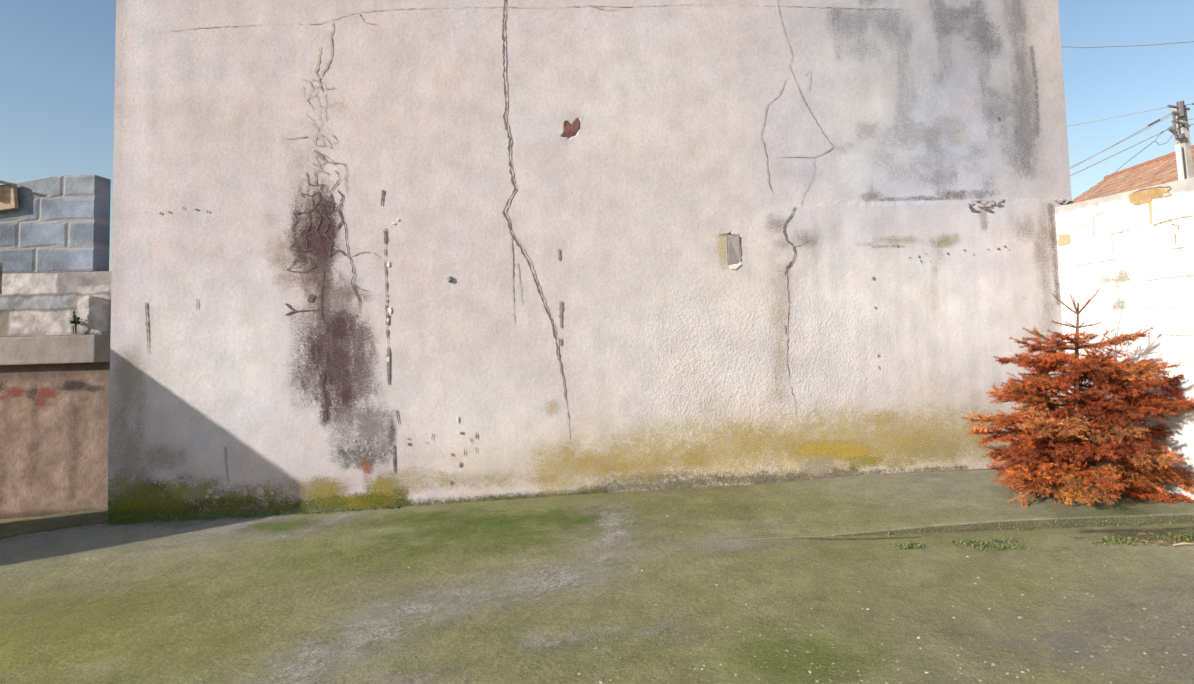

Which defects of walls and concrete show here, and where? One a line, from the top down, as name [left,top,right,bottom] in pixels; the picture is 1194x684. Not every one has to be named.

water stain [273,186,395,468]
crack [154,0,698,473]
crack [760,0,905,426]
water stain [893,103,991,228]
water stain [981,0,1039,173]
water stain [1019,204,1064,325]
water stain [539,414,984,492]